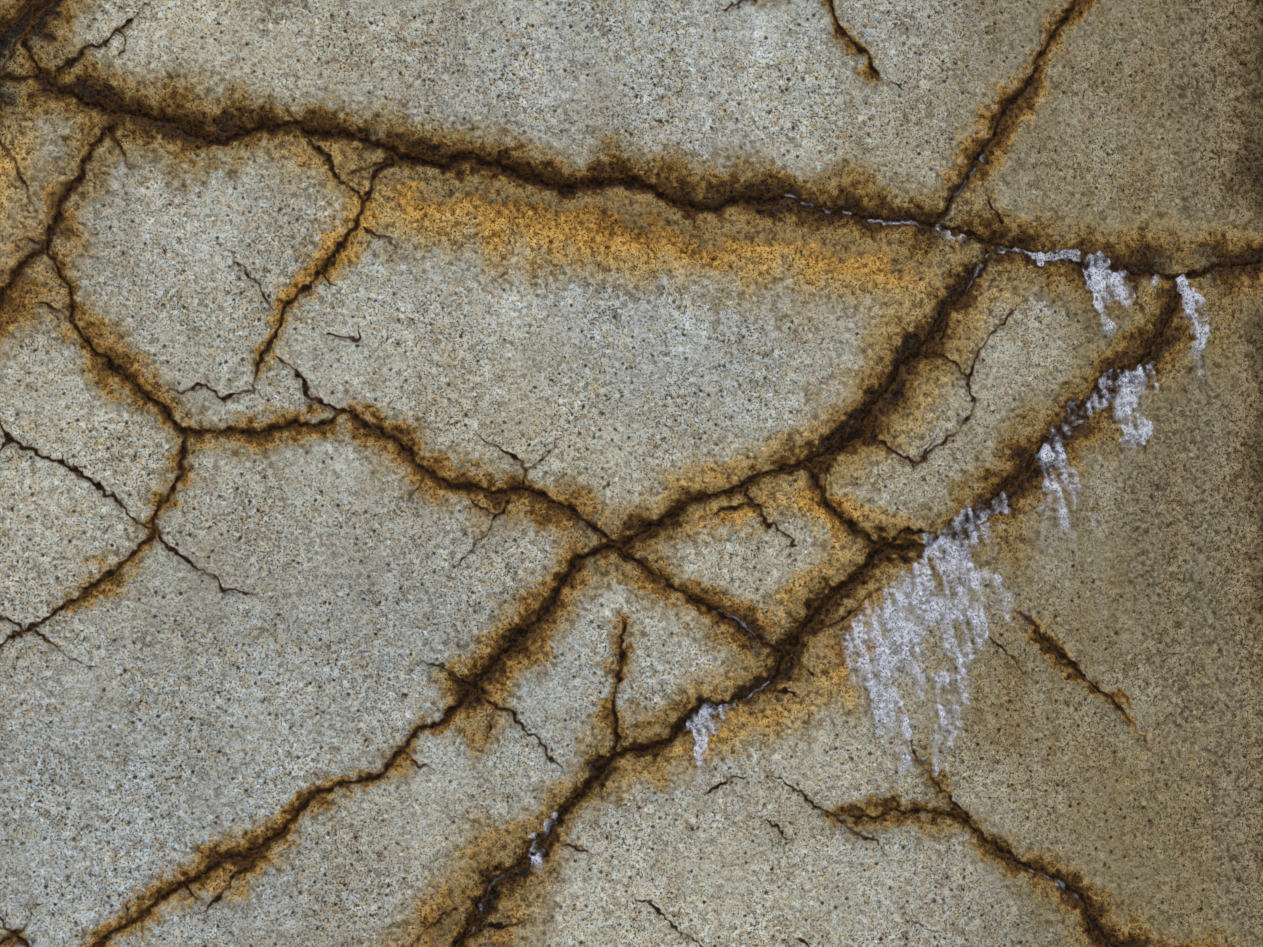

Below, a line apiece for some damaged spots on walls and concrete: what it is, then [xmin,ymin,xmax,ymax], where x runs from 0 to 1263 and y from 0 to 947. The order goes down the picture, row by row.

rust [82,713,428,947]
crack [0,119,620,649]
rust [0,0,986,755]
crack [0,0,1078,403]
rust [382,611,778,947]
crack [92,230,1183,947]
leakage [687,705,724,766]
leakage [844,509,1010,745]
rust [611,0,1263,805]
leakage [1039,429,1080,525]
leakage [1029,250,1128,331]
crack [1045,253,1263,314]